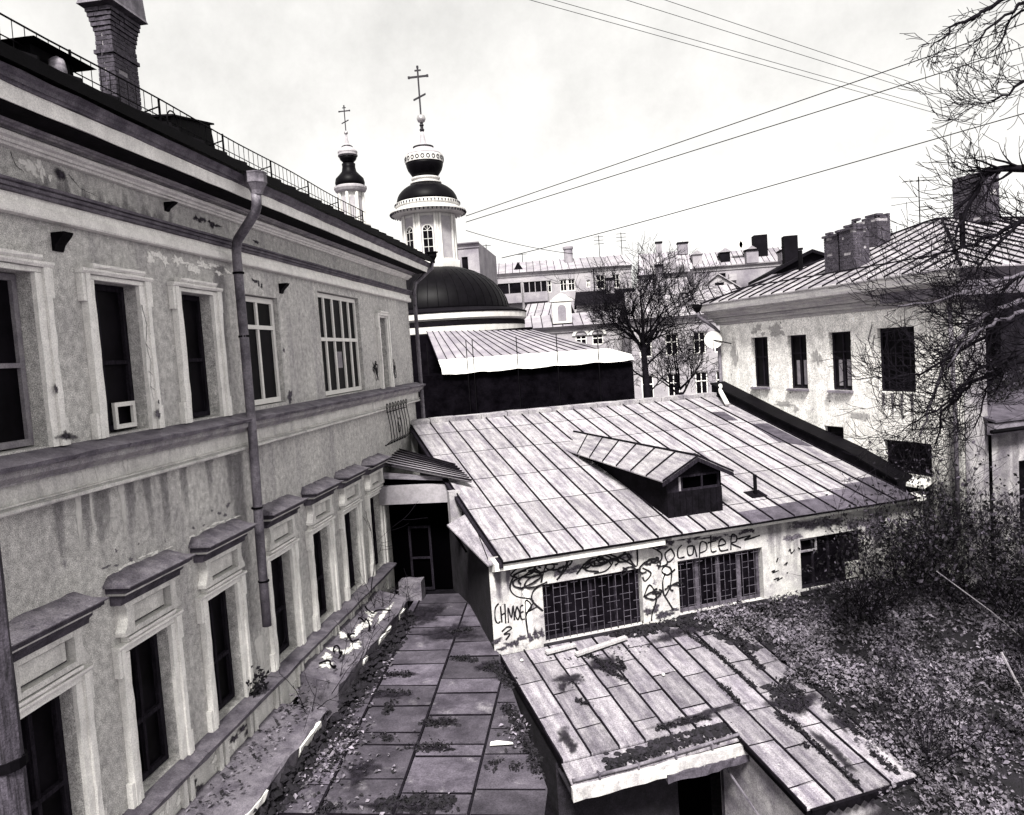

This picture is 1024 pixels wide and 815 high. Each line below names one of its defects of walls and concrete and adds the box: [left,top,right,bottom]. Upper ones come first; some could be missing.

peeling [16,157,66,184]
peeling [147,250,231,276]